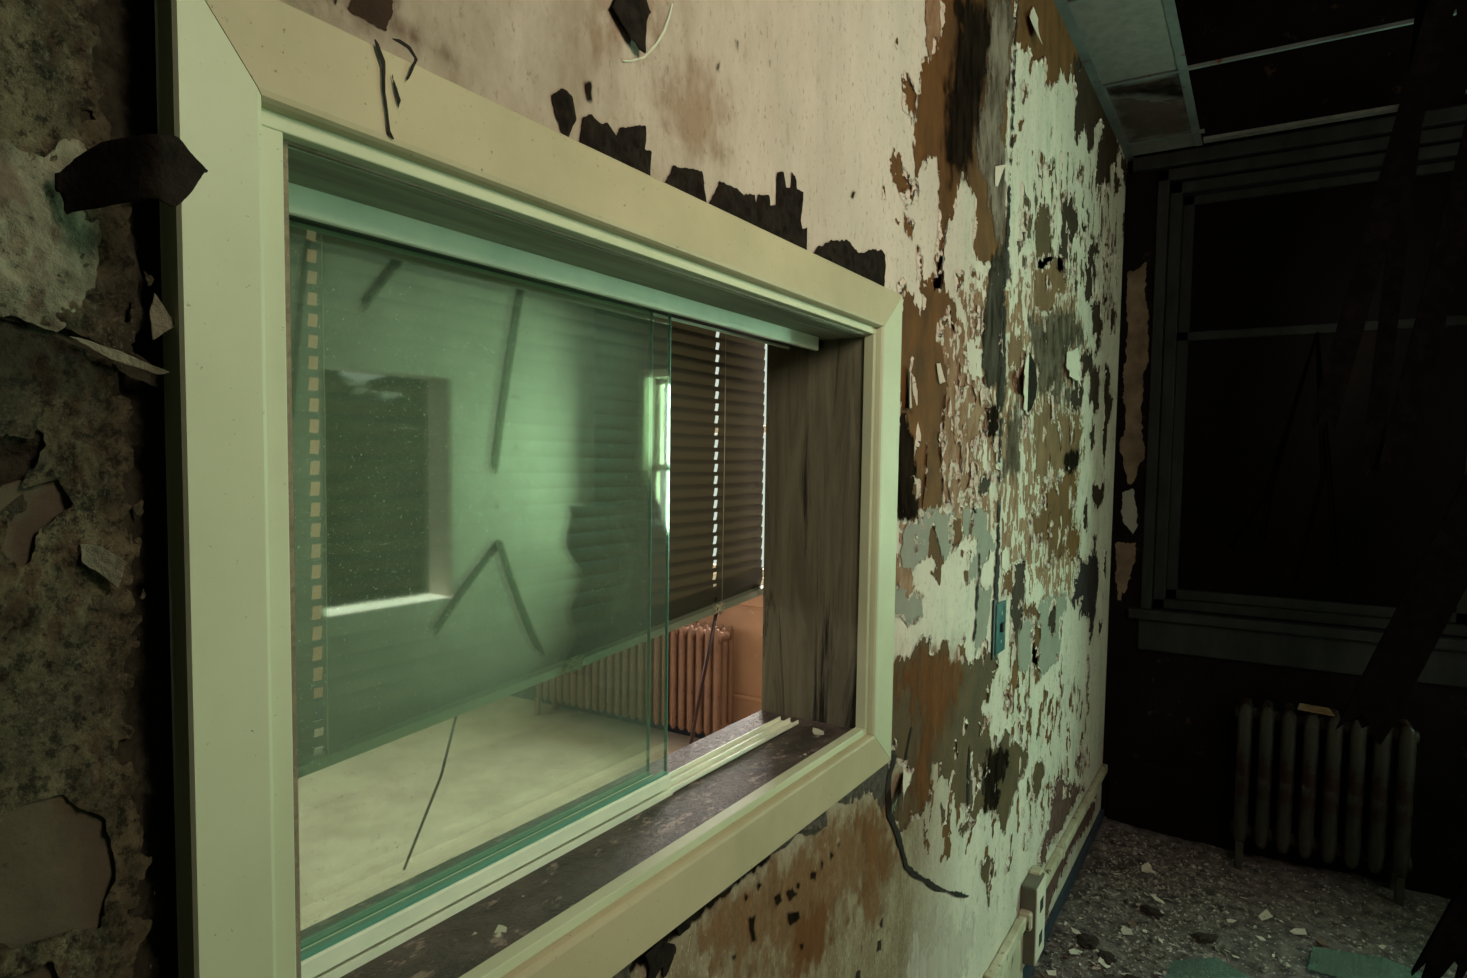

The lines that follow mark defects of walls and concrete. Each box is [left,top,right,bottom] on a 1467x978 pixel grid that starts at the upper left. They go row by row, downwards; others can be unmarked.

crack [0,319,164,388]
peeling [0,430,73,567]
flaking render [55,0,208,978]
peeling [552,0,1128,926]
peeling [2,962,59,978]
peeling [0,795,116,950]
peeling [612,915,693,978]
damp [629,801,897,977]
crack [886,727,969,898]
damp [907,905,975,978]
crack [967,745,985,818]
damp [984,743,1009,818]